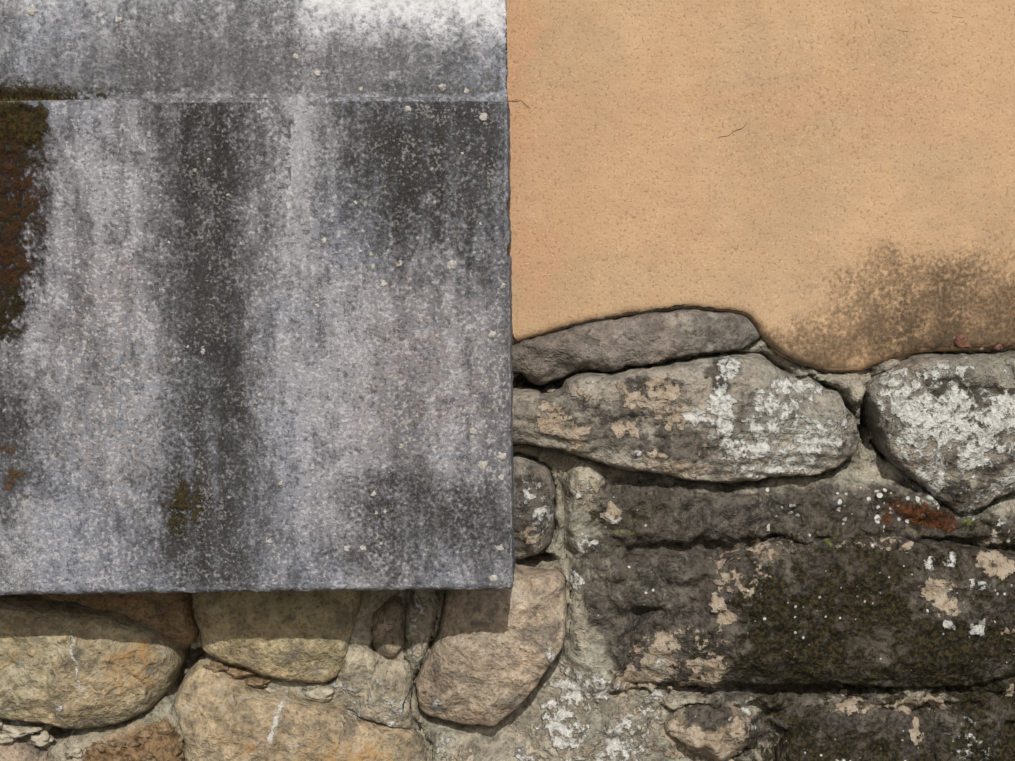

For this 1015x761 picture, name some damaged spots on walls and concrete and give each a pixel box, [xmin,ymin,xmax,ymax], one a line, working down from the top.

corrosion [0,101,56,343]
water stain [31,130,54,282]
water stain [128,0,297,587]
water stain [262,47,505,293]
water stain [0,374,58,524]
water stain [343,461,510,585]